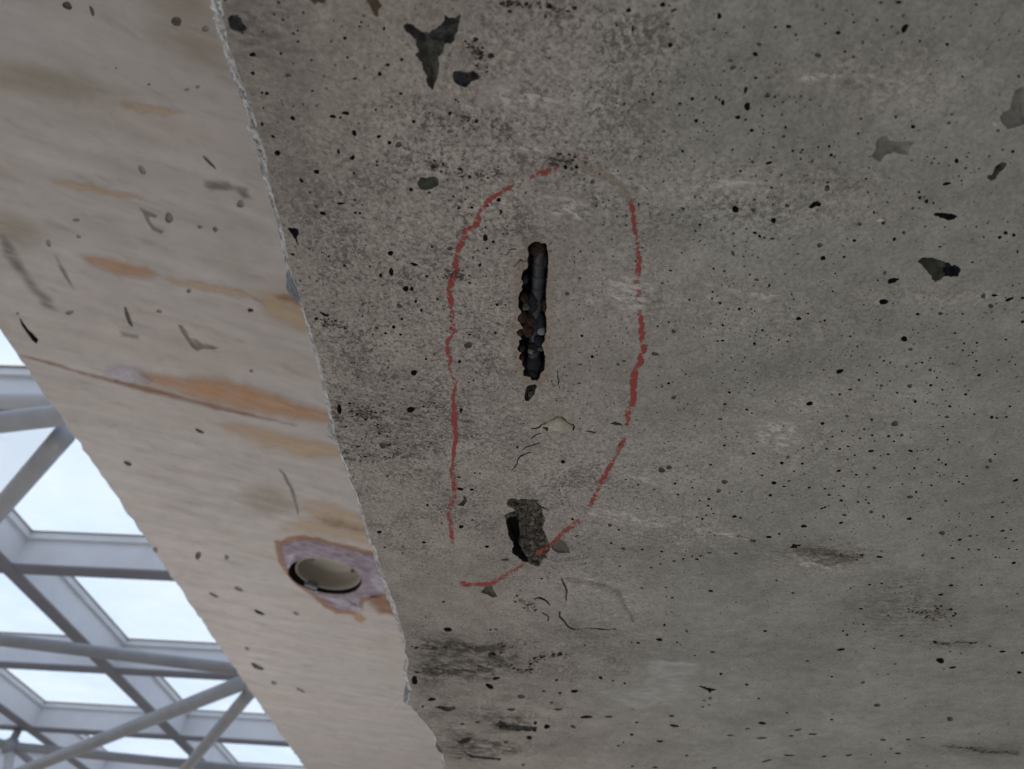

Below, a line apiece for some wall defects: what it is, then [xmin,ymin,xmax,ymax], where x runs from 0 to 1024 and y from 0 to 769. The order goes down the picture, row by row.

spalling [489,236,641,435]
spalling [501,496,579,590]